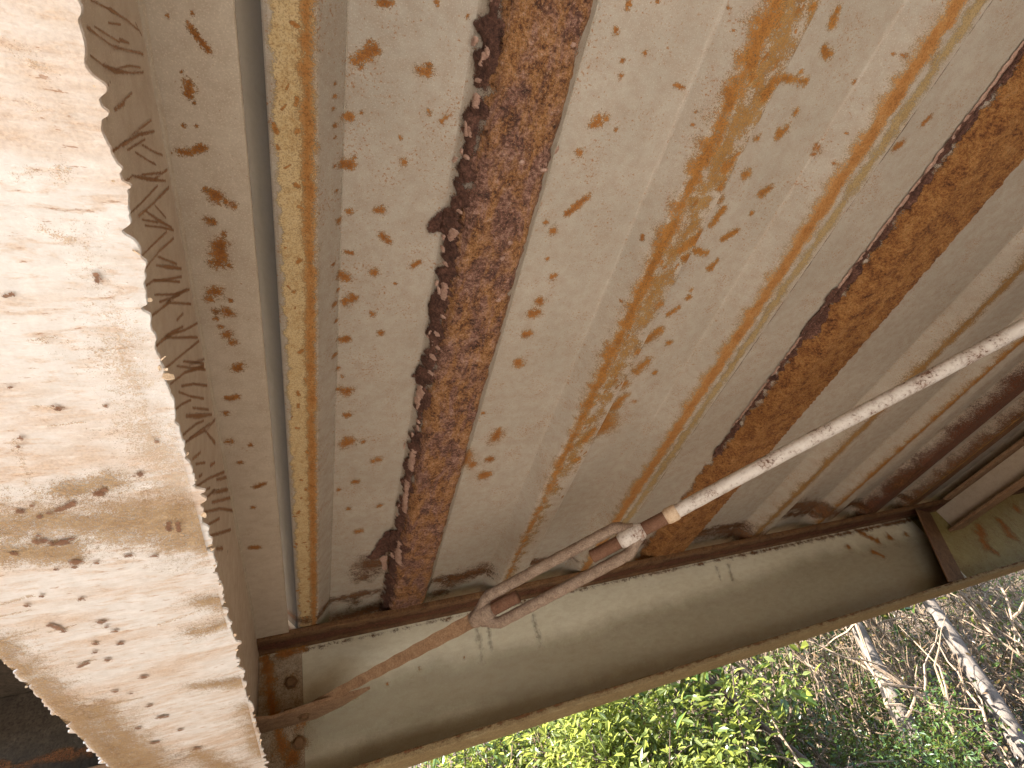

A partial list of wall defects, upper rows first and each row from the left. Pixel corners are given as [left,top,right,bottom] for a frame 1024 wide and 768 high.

peeling [471,35,490,109]
peeling [459,120,472,160]
peeling [440,228,460,267]
peeling [434,280,449,301]
rust [425,0,821,601]
rust [569,0,1024,593]
rust [0,0,479,768]
peeling [426,330,441,376]
rust [456,523,1024,738]